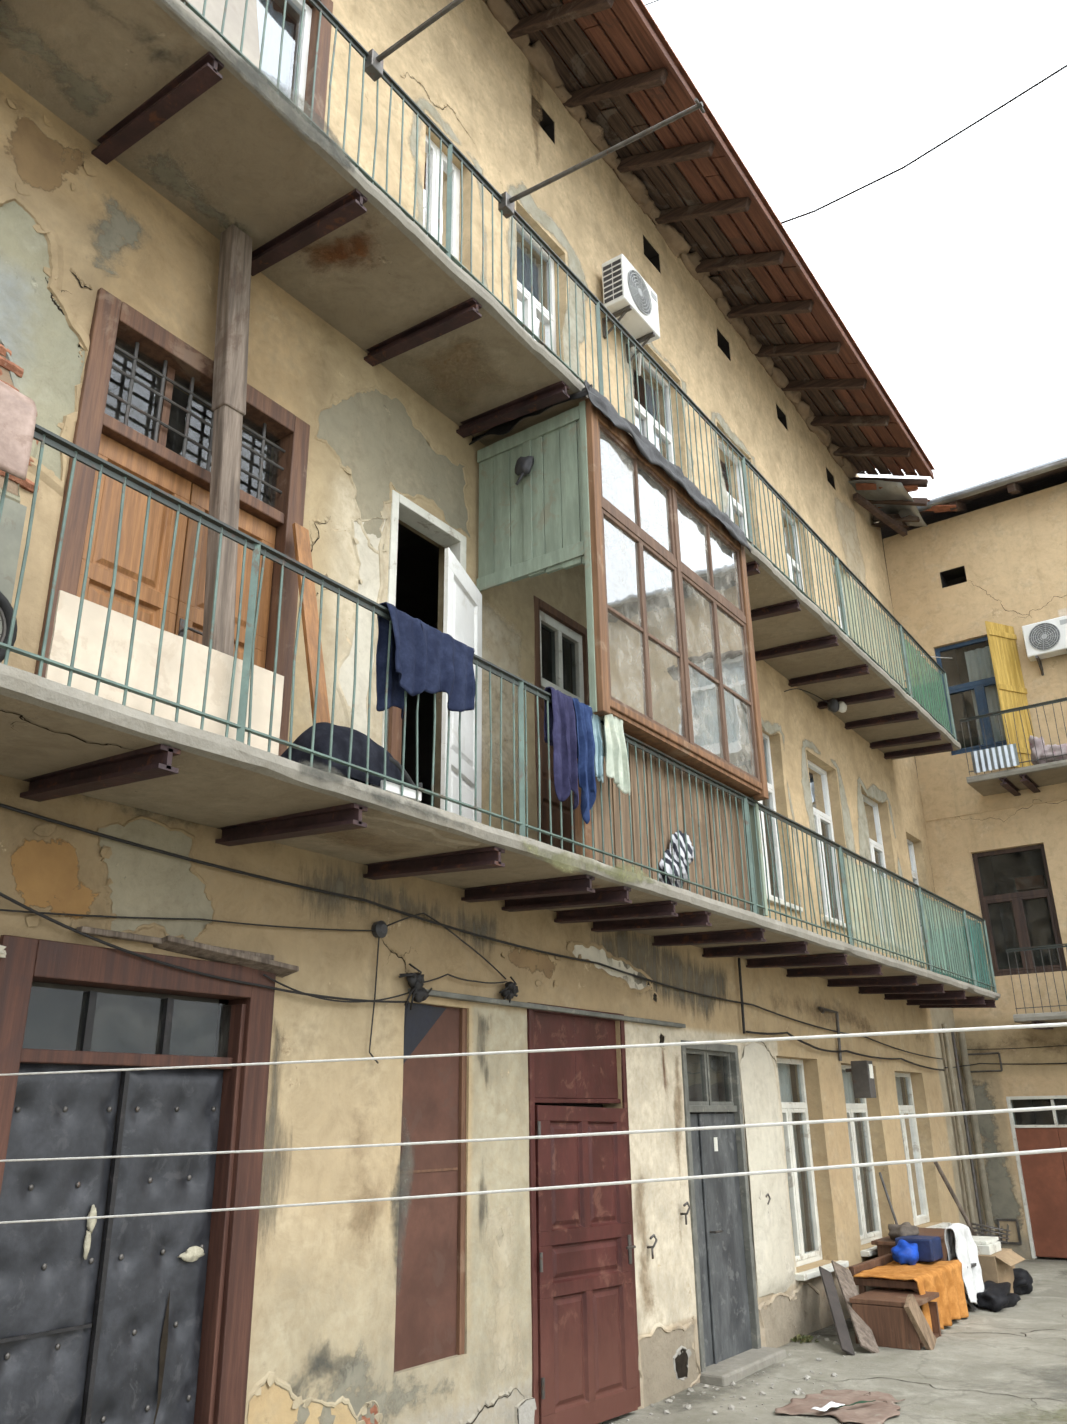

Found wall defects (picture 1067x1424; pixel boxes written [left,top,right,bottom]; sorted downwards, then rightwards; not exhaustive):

flaking render [0,99,96,504]
flaking render [314,385,472,739]
flaking render [11,815,216,943]
flaking render [501,940,658,1005]
flaking render [244,1371,383,1424]
crack [412,1386,522,1424]